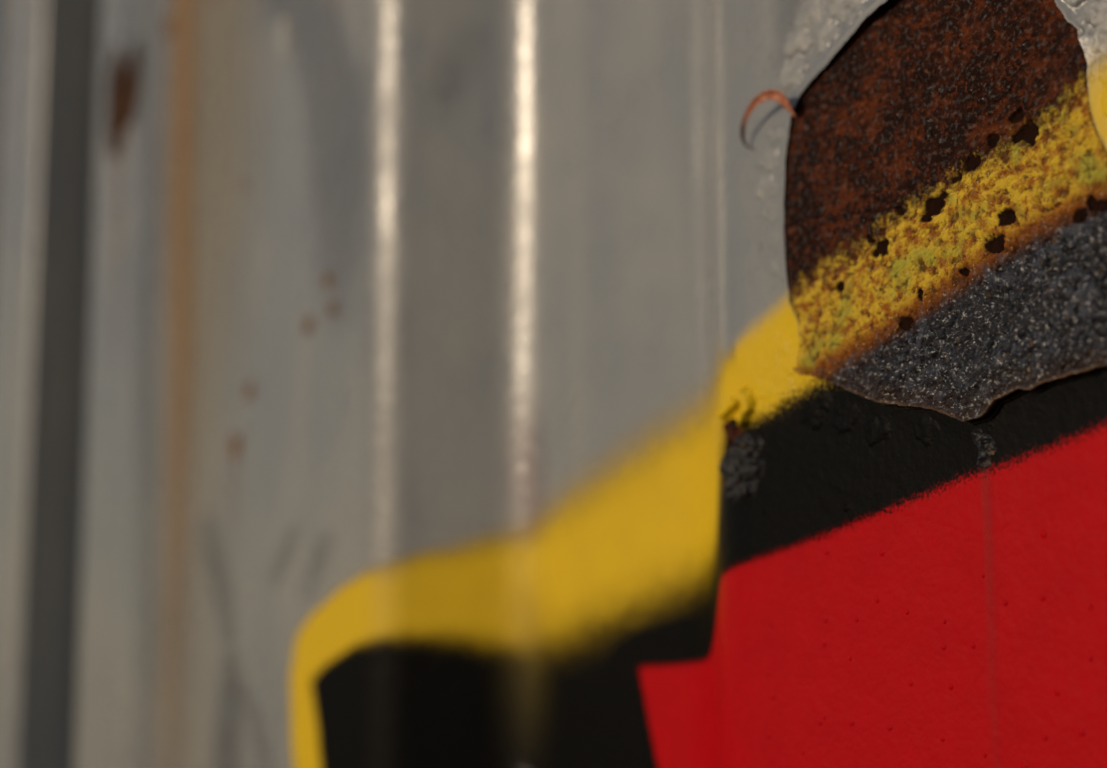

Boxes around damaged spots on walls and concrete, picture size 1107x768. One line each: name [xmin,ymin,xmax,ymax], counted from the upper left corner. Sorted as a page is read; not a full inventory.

peeling [716,0,1107,536]